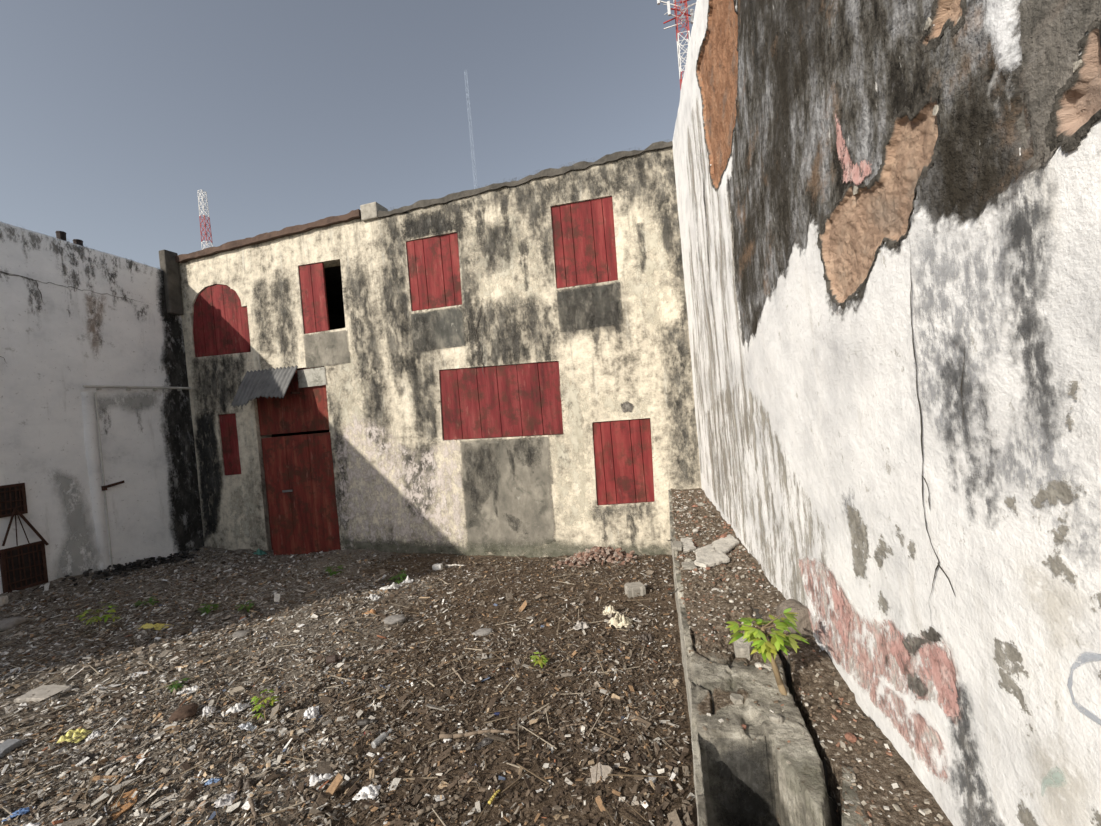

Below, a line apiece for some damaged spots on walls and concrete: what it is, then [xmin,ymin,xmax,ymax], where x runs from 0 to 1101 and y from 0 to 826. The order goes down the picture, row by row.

peeling [1007,0,1101,172]
leakage [0,227,140,302]
crack [0,271,148,305]
leakage [99,269,244,553]
leakage [254,275,296,367]
leakage [328,397,670,558]
leakage [344,150,698,518]
peeling [687,0,967,780]
leakage [727,0,1076,518]
crack [909,237,956,627]